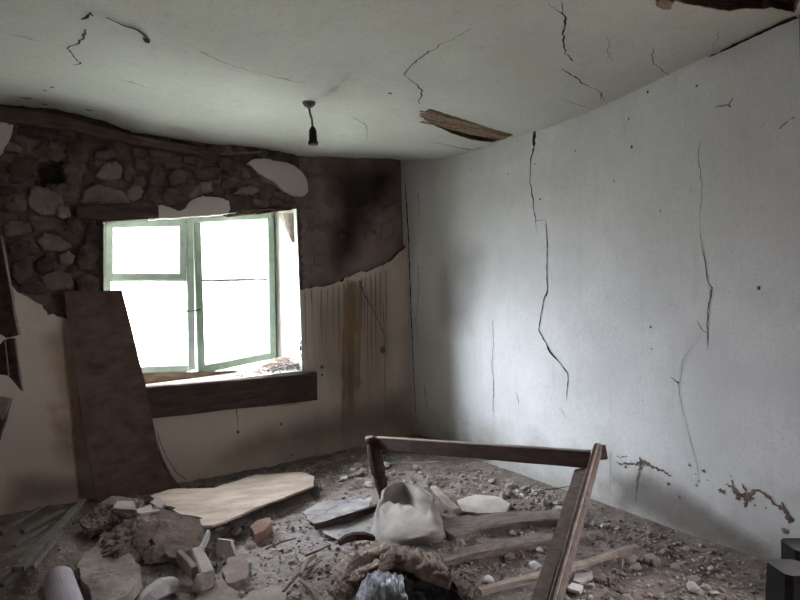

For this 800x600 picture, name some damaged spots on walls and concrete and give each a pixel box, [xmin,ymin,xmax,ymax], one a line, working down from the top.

crack [66,12,150,65]
crack [404,28,472,104]
crack [551,2,605,108]
peeling [656,0,674,10]
crack [708,16,798,58]
spalling [0,97,403,319]
crack [529,131,568,416]
crack [697,145,713,350]